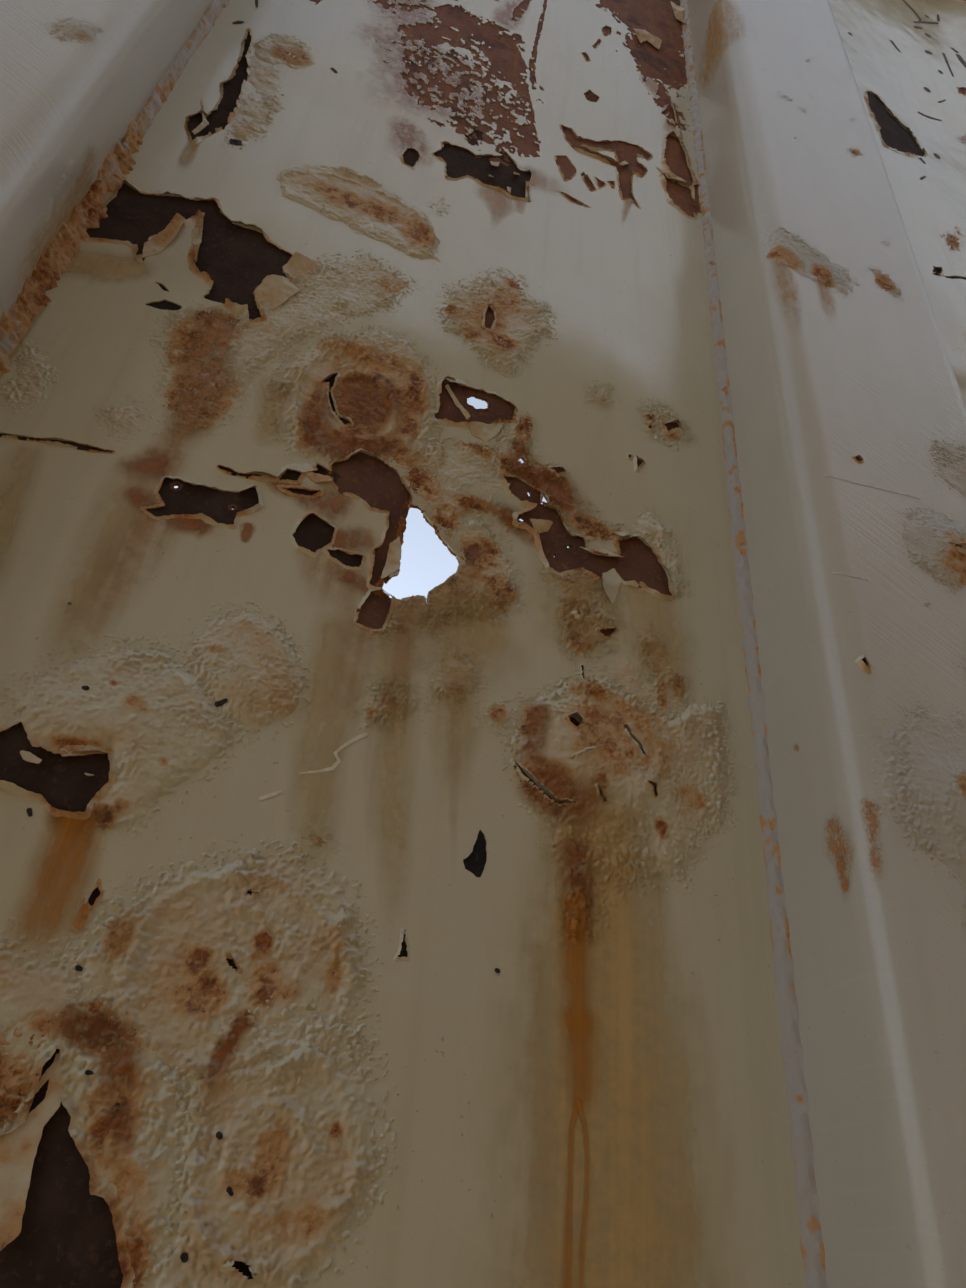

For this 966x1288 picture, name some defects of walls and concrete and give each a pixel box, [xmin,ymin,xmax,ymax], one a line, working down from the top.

peeling [373,0,701,220]
peeling [863,90,928,158]
peeling [81,180,323,325]
peeling [434,376,518,442]
peeling [139,475,264,530]
peeling [273,448,413,632]
peeling [499,469,676,605]
peeling [0,715,118,820]
rust [827,819,850,892]
rust [863,800,880,867]
rust [563,840,592,1288]
peeling [0,1037,135,1288]